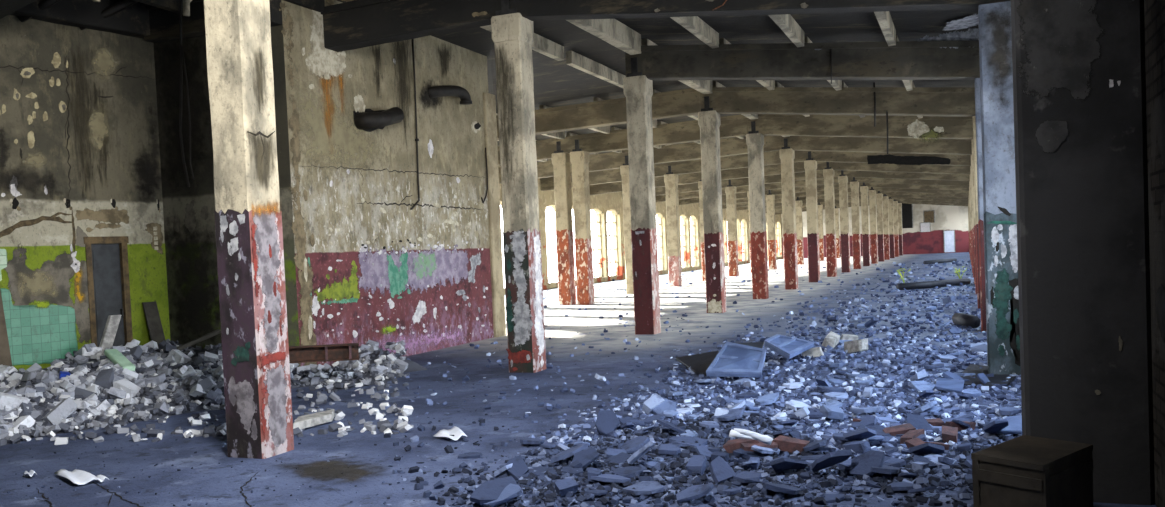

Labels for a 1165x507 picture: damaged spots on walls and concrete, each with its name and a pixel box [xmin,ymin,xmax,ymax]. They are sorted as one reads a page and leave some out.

peeling [0,68,67,149]
peeling [49,52,68,87]
crack [0,47,154,252]
corrosion [297,74,378,168]
flaking render [4,198,129,344]
peeling [220,0,488,447]
peeling [990,206,1021,366]